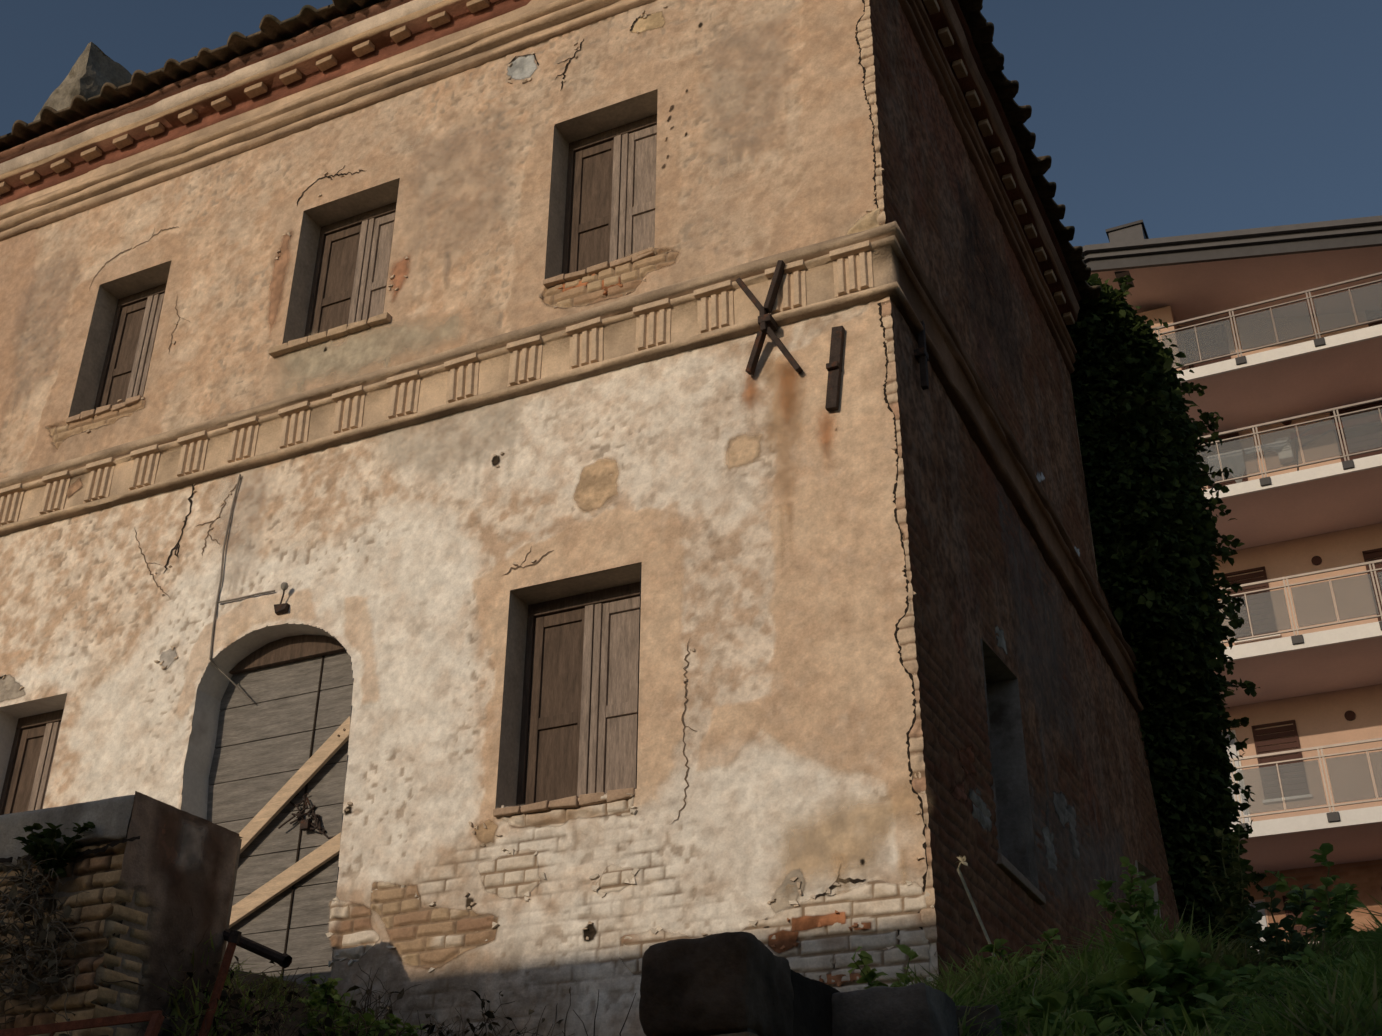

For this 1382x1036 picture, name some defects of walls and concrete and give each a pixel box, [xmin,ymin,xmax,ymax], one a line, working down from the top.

peeling [507,52,538,84]
crack [297,167,367,205]
spalling [539,247,679,309]
peeling [726,434,762,468]
crack [134,476,242,600]
spalling [741,300,937,992]
peeling [0,674,25,702]
crack [673,639,695,822]
spalling [325,793,640,972]
spalling [619,926,702,975]